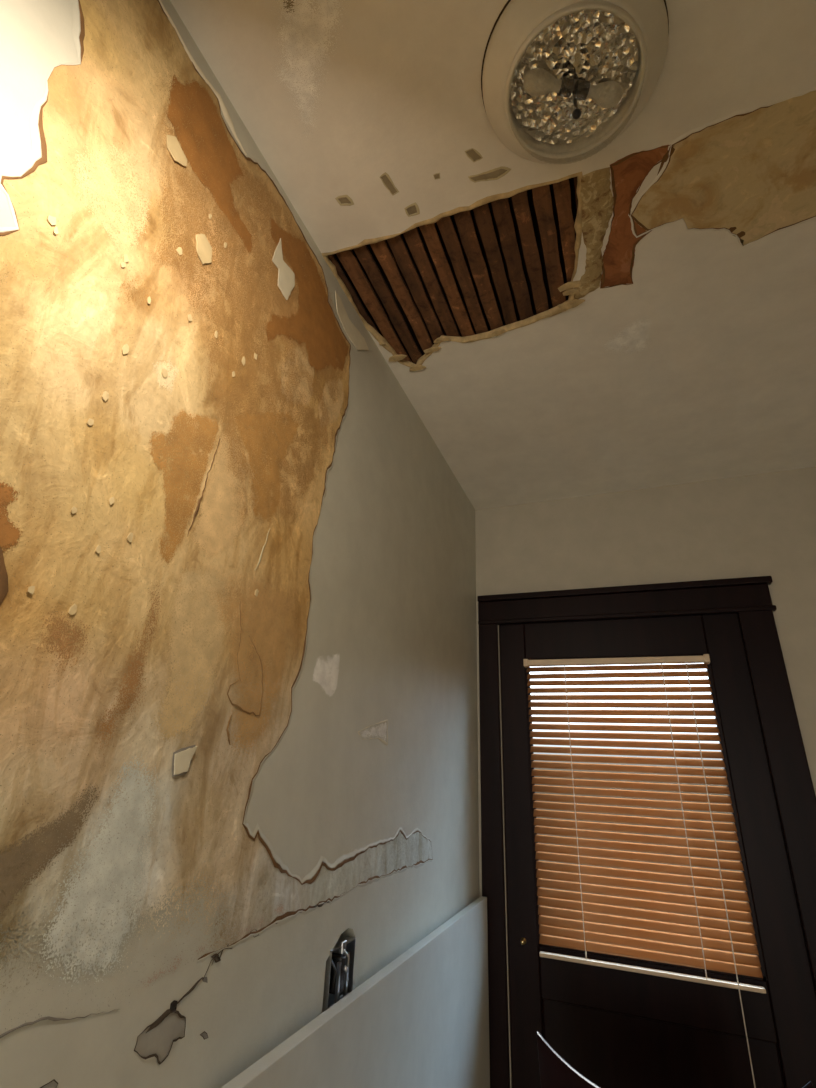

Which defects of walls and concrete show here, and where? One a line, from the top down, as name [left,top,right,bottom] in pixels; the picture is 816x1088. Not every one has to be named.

leakage [150,65,347,531]
peeling [0,0,586,994]
leakage [0,783,101,916]
crack [0,1009,117,1038]
peeling [134,1010,186,1065]
crack [146,948,230,1033]